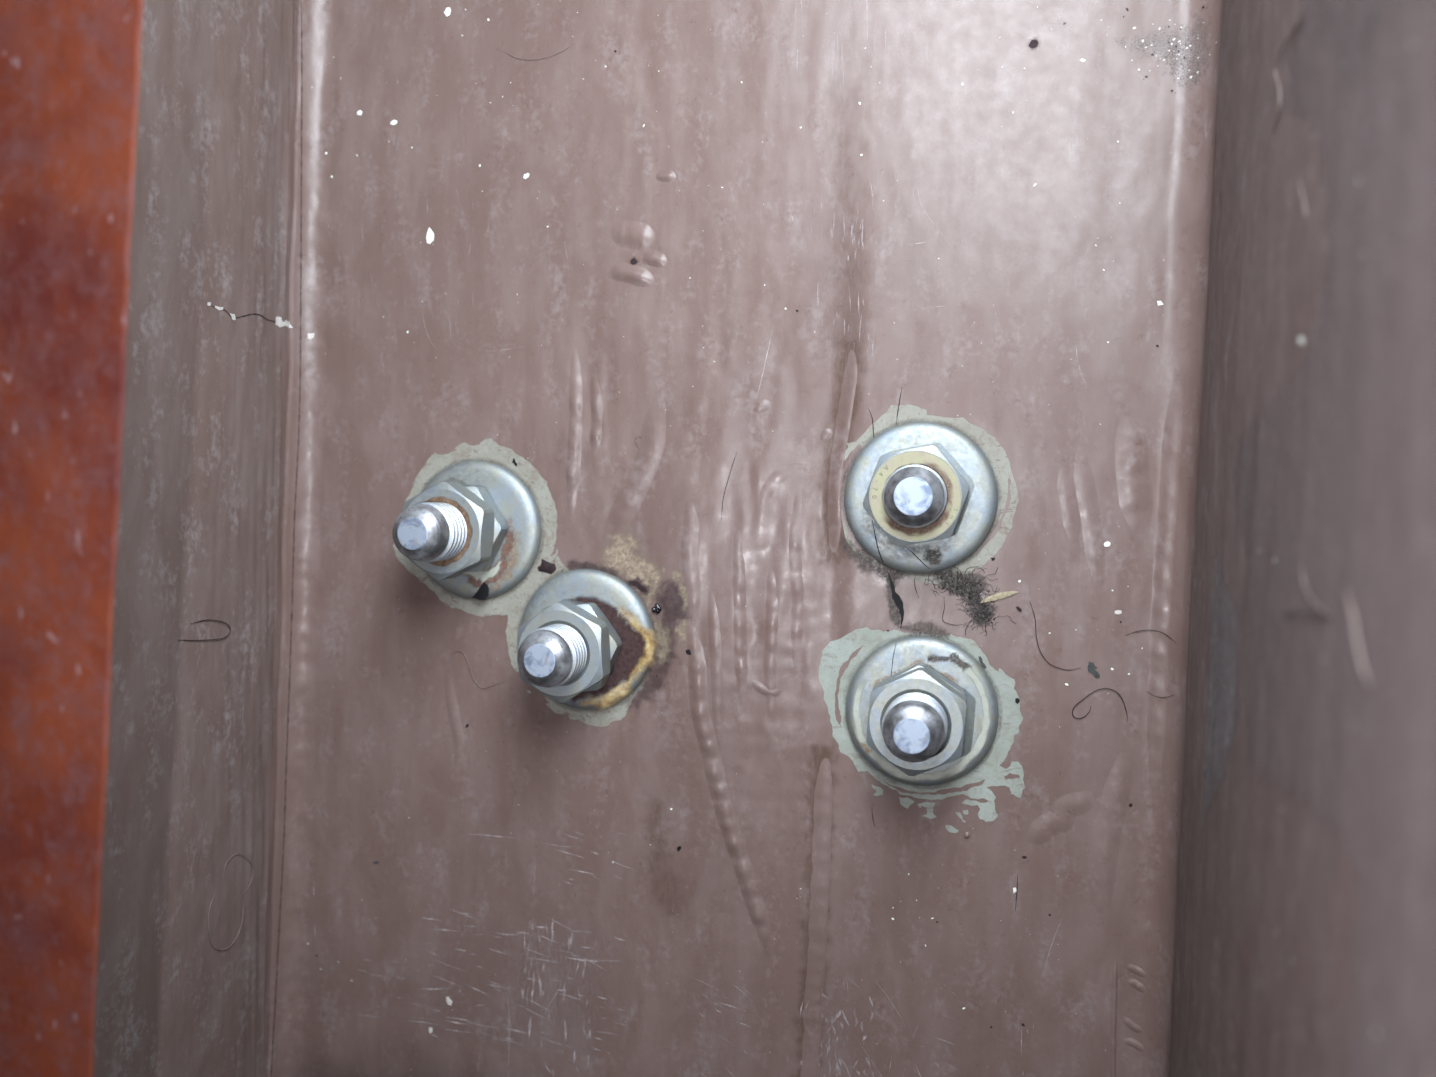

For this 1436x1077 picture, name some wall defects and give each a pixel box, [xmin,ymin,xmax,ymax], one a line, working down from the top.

rust [425,497,517,587]
peeling [393,438,569,672]
peeling [527,677,645,727]
rust [568,533,688,706]
peeling [819,627,1025,833]